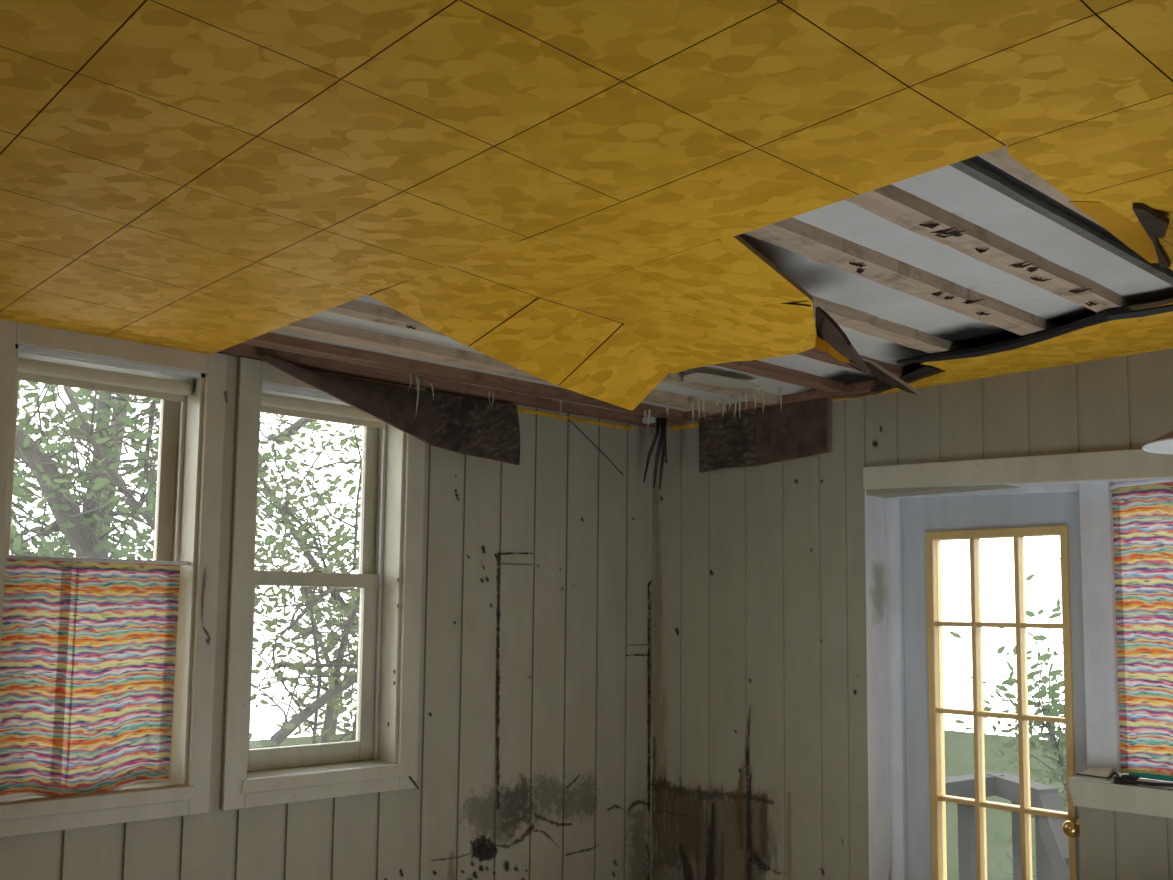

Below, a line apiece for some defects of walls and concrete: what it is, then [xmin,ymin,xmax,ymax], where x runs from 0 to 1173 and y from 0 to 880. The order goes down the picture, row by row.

peeling [1069,201,1171,269]
peeling [683,373,765,420]
water stain [607,709,780,880]
water stain [433,814,599,880]